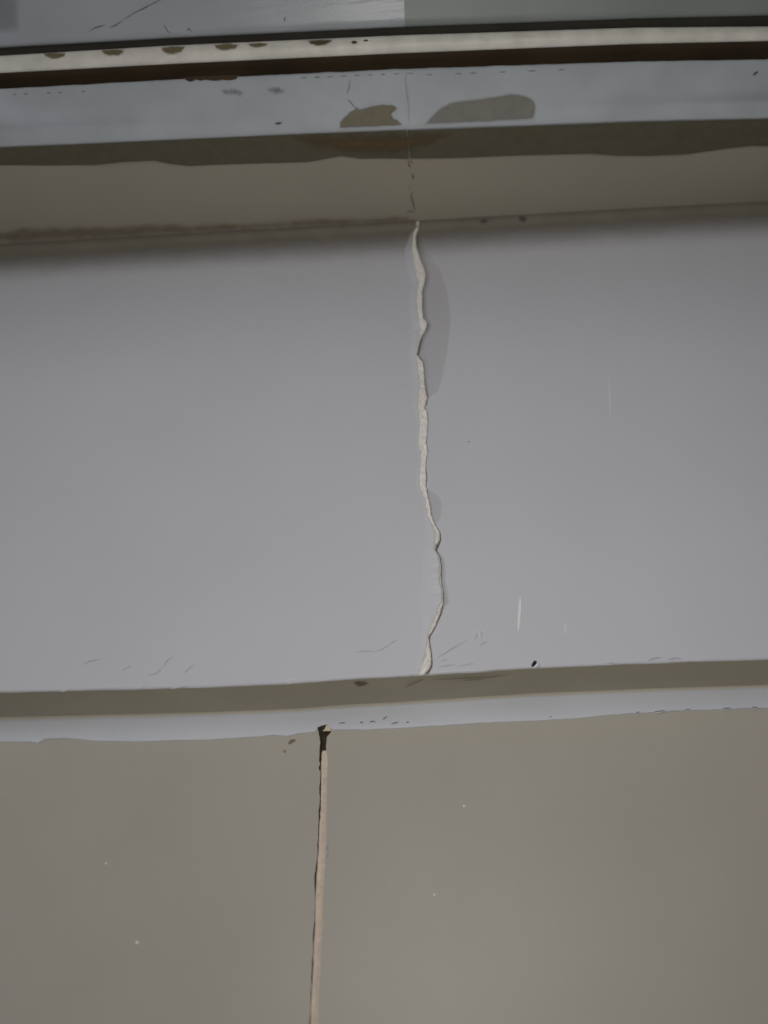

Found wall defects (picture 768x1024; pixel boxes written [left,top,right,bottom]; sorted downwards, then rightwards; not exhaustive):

peeling [340,105,400,127]
peeling [428,95,535,123]
crack [357,160,512,687]
crack [309,716,409,1024]